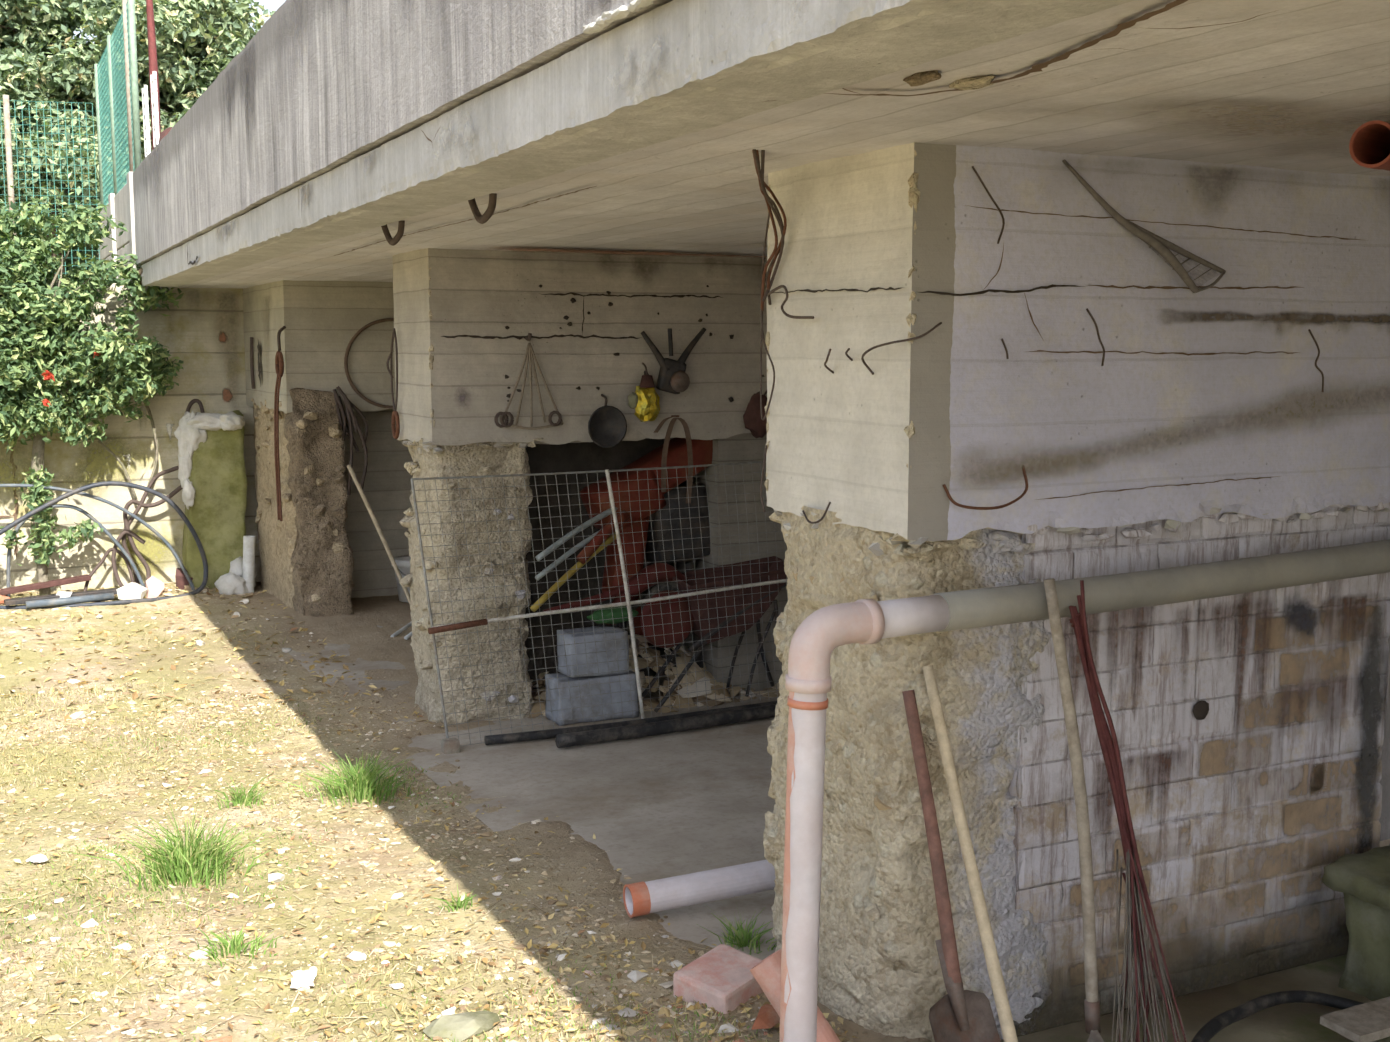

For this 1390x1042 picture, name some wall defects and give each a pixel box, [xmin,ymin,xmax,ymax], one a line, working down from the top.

peeling [582,0,656,34]
crack [824,0,1275,96]
crack [773,206,1360,356]
damp [1183,312,1390,331]
spalling [251,388,355,617]
spalling [769,510,820,536]
spalling [868,502,1390,562]
spalling [400,508,442,670]
damp [1284,600,1318,635]
damp [1357,612,1384,853]